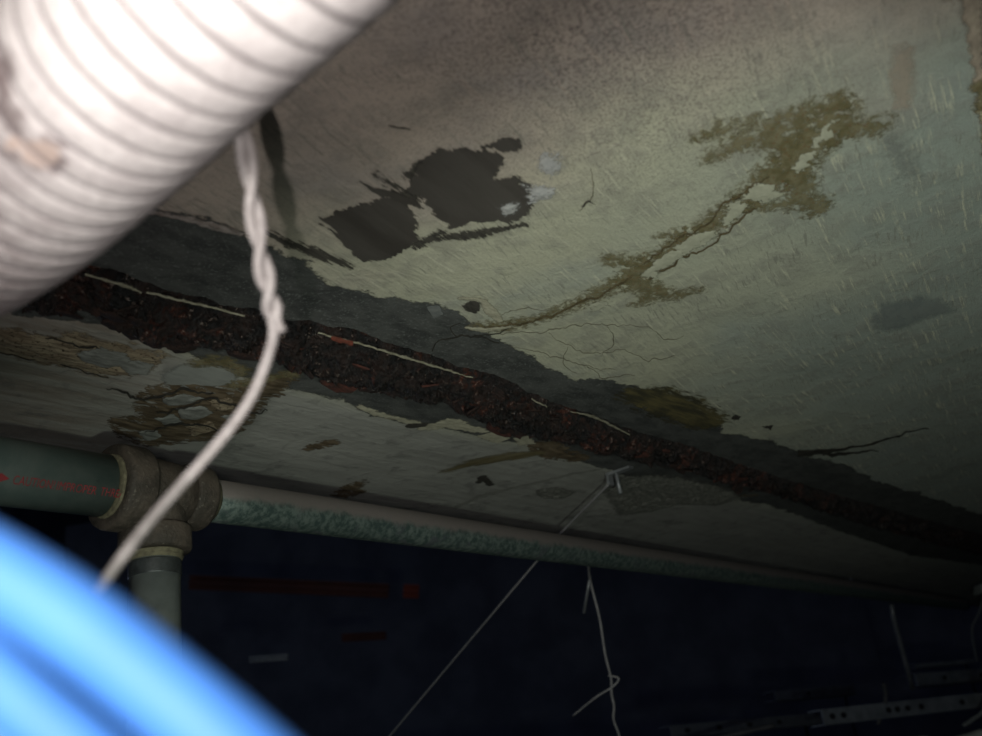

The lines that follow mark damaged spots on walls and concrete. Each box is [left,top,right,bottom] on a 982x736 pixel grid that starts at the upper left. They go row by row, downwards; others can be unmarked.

crack [962,0,982,143]
peeling [87,209,263,311]
efflorescence [500,151,565,215]
crack [580,171,595,211]
peeling [266,137,982,534]
peeling [0,307,982,565]
corrosion [22,265,982,555]
crack [798,428,929,457]